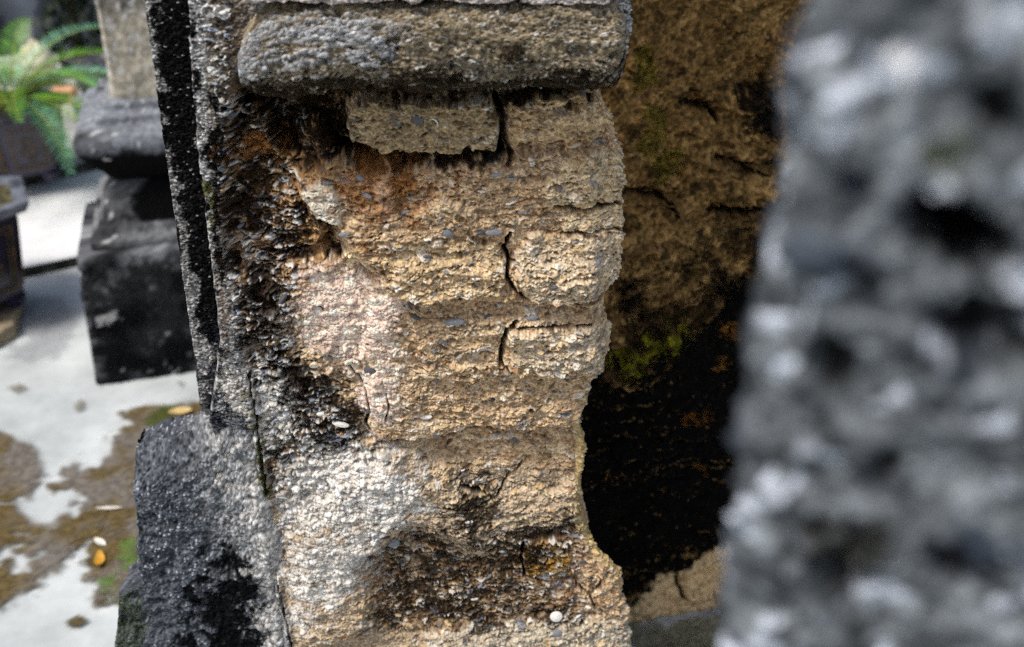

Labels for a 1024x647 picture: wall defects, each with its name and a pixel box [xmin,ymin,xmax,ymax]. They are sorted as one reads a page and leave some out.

crack [492,90,514,161]
crack [502,231,523,294]
leakage [0,0,627,647]
crack [499,303,592,373]